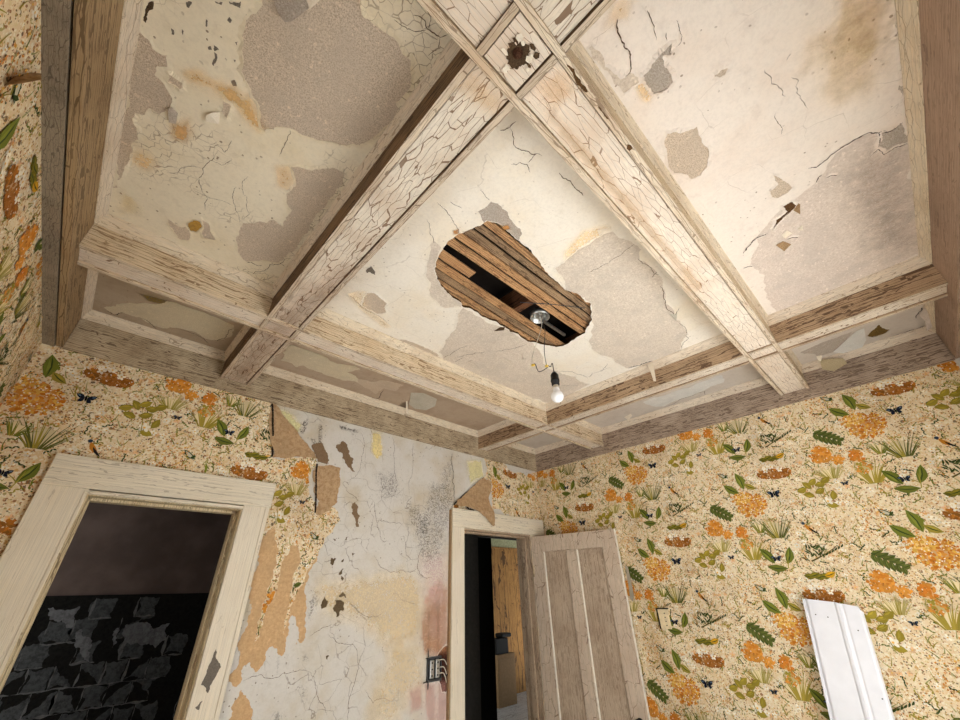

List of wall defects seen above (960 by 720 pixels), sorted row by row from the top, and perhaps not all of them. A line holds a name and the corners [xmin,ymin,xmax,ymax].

peeling [113,0,188,190]
peeling [215,0,416,149]
crack [616,20,632,76]
crack [765,55,806,134]
peeling [164,216,219,243]
crack [167,142,247,220]
peeling [232,163,349,264]
peeling [750,119,918,312]
peeling [400,238,591,403]
peeling [552,229,690,381]
crack [348,504,430,617]
crack [244,626,399,718]